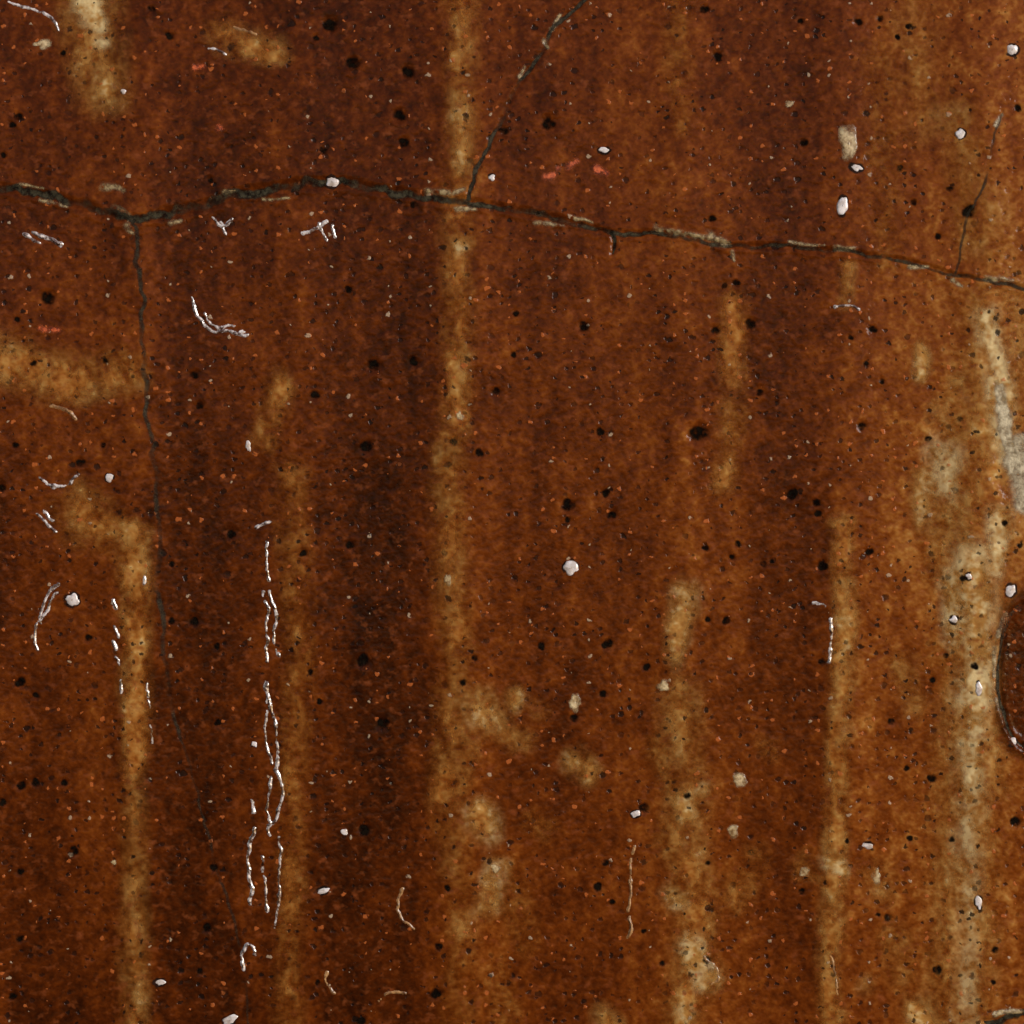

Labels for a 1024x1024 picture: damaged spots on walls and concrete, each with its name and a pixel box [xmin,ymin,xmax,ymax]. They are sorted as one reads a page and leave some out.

crack [518,0,587,81]
crack [993,114,1003,140]
crack [207,129,1024,291]
crack [0,183,182,452]
damp [432,0,476,810]
crack [157,592,166,648]
damp [906,284,1024,1024]
damp [472,690,526,746]
damp [468,802,494,837]